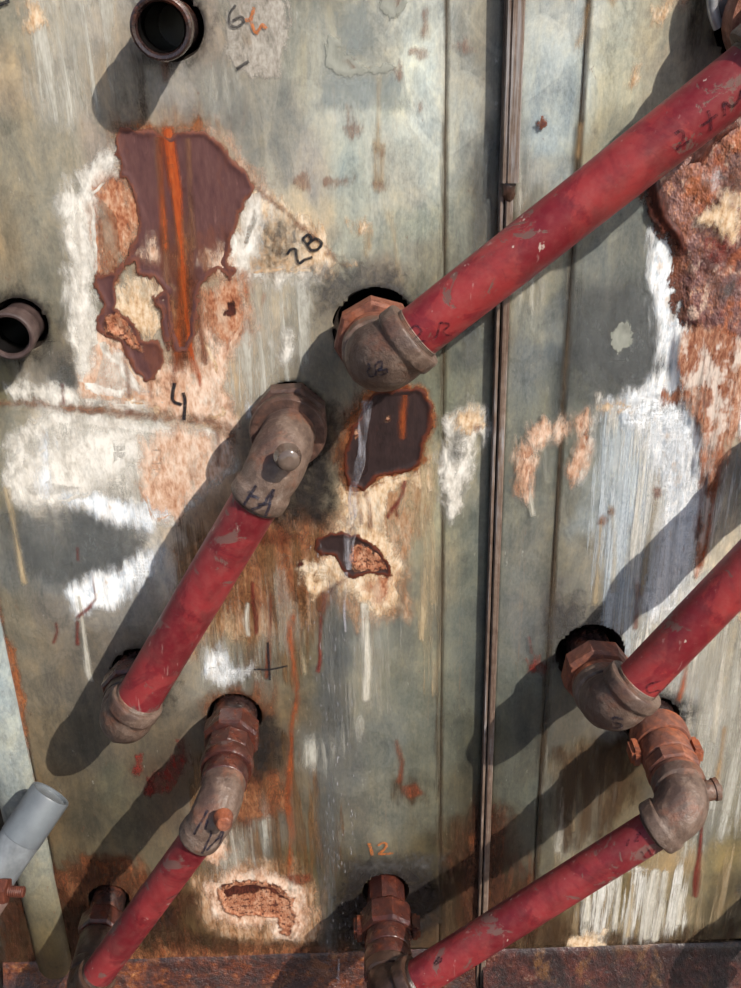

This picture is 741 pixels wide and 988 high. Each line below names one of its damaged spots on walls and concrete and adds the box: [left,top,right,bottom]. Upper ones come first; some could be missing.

peeling [380,0,407,18]
efflorescence [3,380,235,583]
corrosion [56,117,266,436]
corrosion [192,384,443,686]
peeling [513,392,602,515]
water stain [591,384,741,657]
corrosion [605,117,741,579]
water stain [555,740,628,852]
efflorescence [567,863,687,947]
water stain [679,613,741,840]